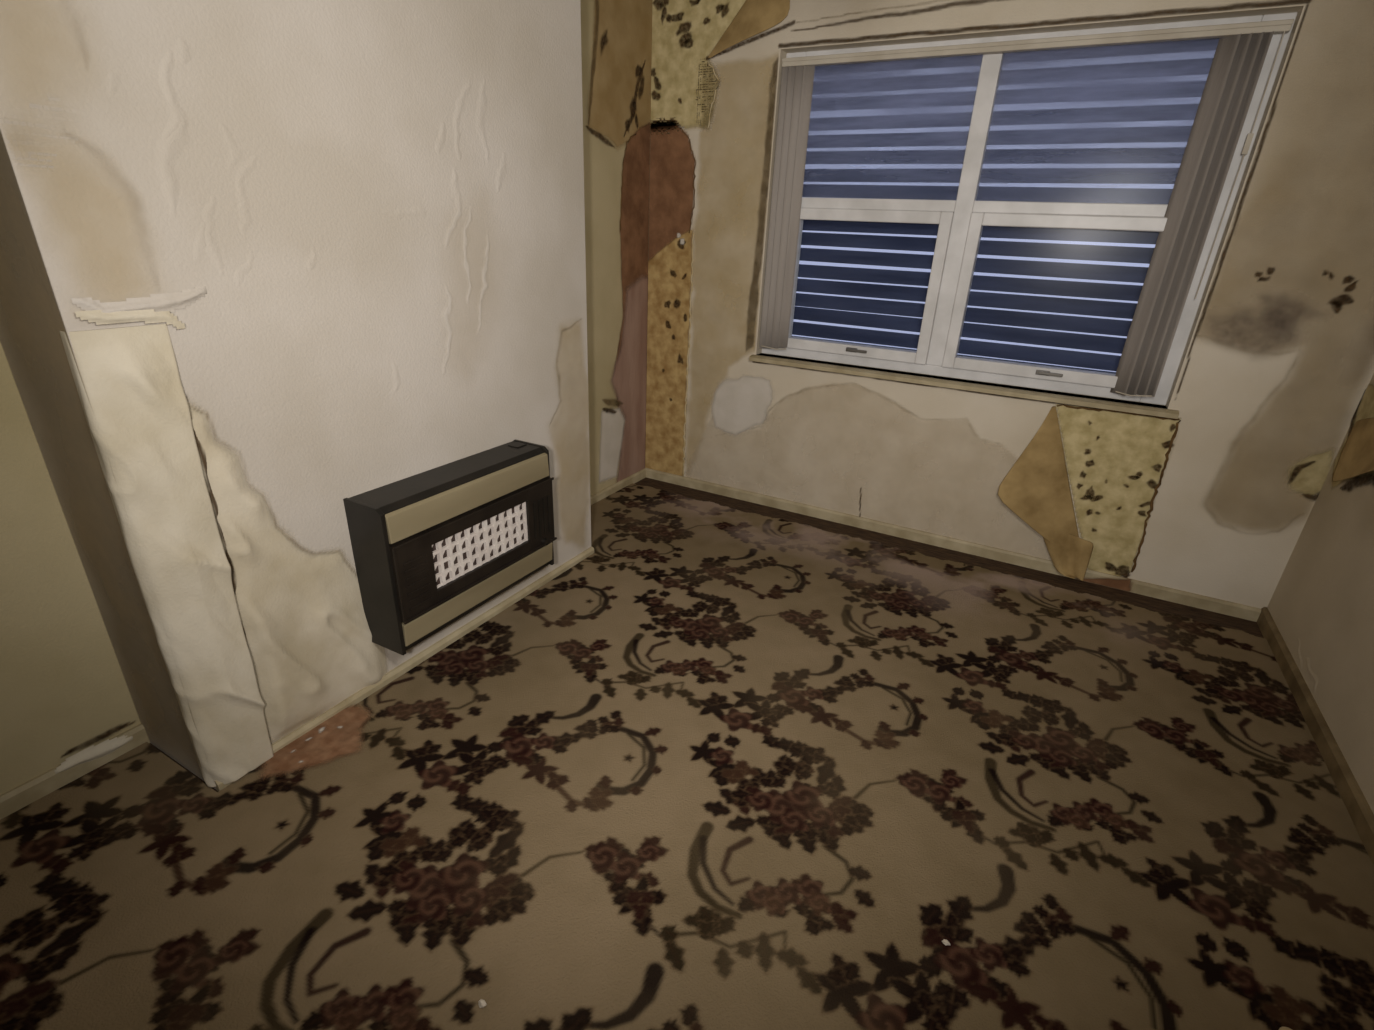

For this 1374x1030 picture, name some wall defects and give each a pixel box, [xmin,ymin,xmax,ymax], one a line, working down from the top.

peeling [586,0,795,482]
water stain [1323,272,1357,313]
crack [193,429,248,645]
water stain [704,376,772,435]
peeling [998,404,1181,581]
peeling [1290,384,1374,500]